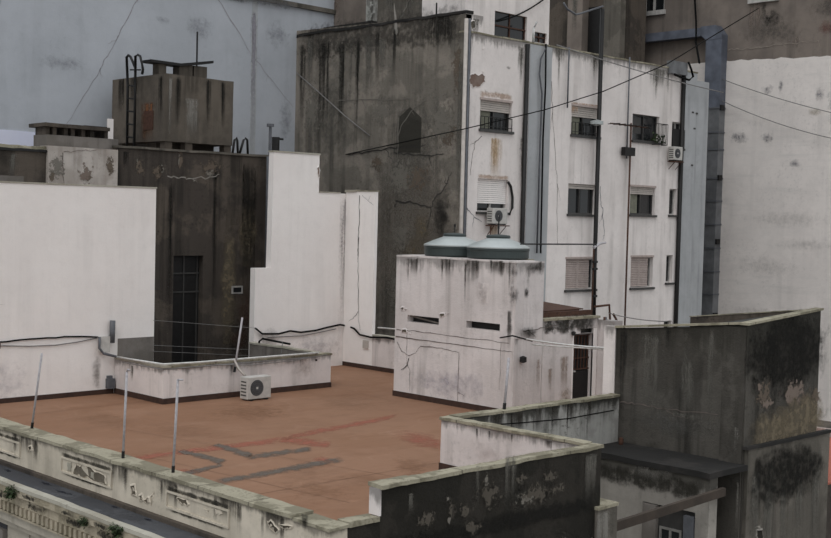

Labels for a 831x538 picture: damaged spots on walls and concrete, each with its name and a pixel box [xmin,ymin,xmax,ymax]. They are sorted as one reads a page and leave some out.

crack [66,0,138,124]
water stain [300,7,454,115]
peeling [422,35,488,152]
crack [167,174,218,182]
crack [337,98,482,239]
water stain [377,151,455,319]
crack [396,329,511,382]
water stain [747,317,824,394]
peeling [756,376,820,411]
spalling [67,462,107,485]
peeling [515,469,565,506]
water stain [752,397,822,531]